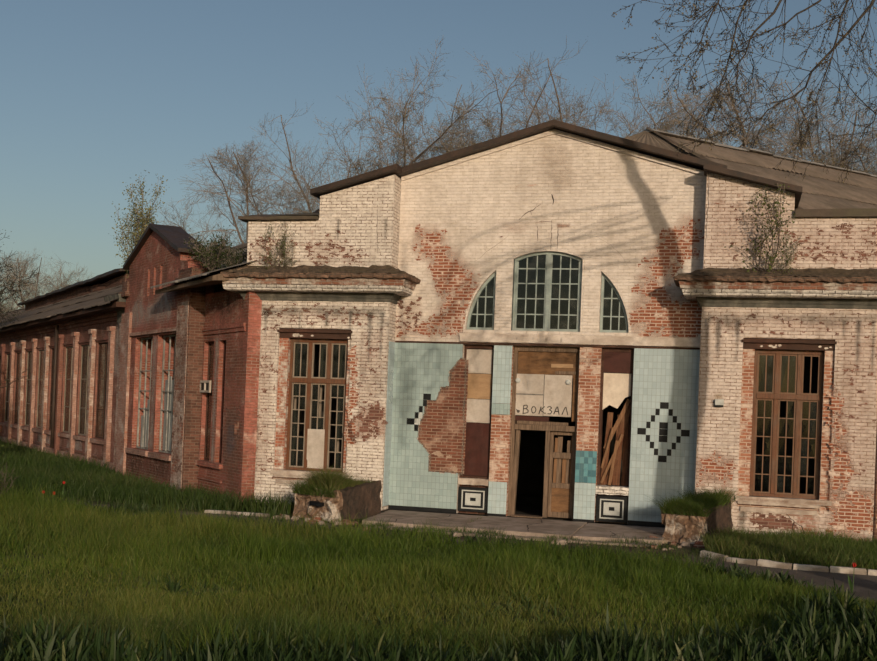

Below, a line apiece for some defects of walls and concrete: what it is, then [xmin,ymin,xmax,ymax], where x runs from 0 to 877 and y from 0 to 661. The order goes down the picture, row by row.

spalling [249,230,369,266]
spalling [749,223,877,263]
peeling [395,224,481,338]
peeling [629,219,805,348]
spalling [261,303,374,337]
peeling [344,328,388,445]
peeling [819,322,877,534]
peeling [696,450,739,487]
peeling [750,512,798,530]